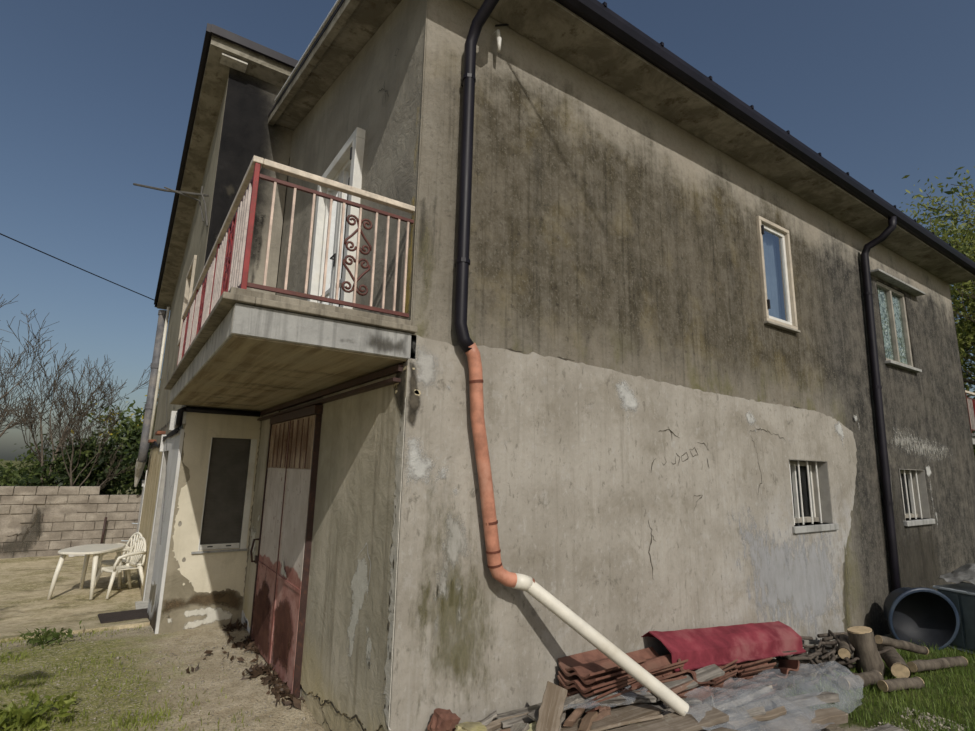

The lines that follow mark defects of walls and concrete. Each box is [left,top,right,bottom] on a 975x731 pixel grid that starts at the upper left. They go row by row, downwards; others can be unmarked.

leakage [204,69,276,266]
flaking render [370,338,403,350]
leakage [892,431,946,459]
flaking render [149,423,250,634]
spalling [301,361,421,731]
leakage [427,515,466,620]
leakage [880,480,939,588]